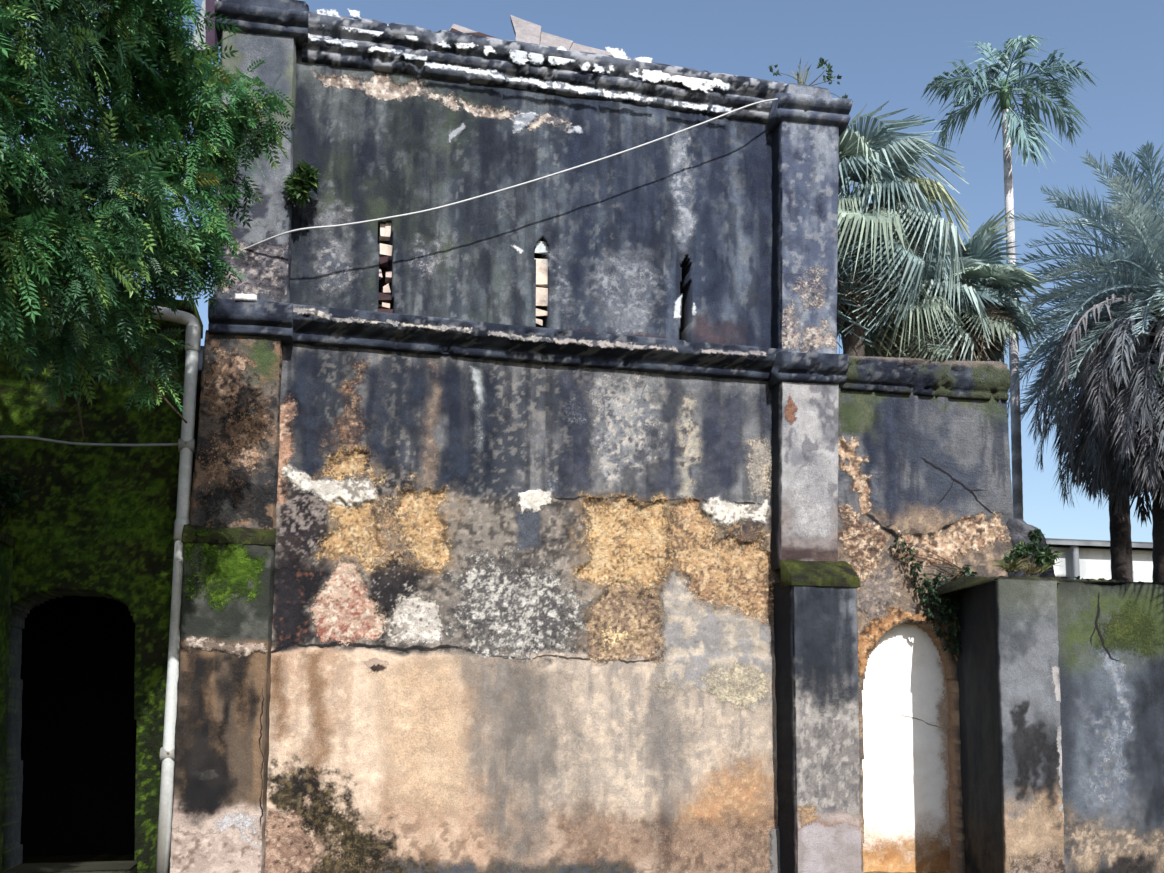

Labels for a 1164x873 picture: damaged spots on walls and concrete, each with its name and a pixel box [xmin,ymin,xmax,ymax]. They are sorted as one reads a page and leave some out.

spalling [313,72,583,143]
peeling [308,9,732,112]
peeling [782,268,837,353]
water stain [174,348,331,816]
water stain [361,552,425,645]
spalling [184,347,776,712]
water stain [542,371,749,500]
spalling [789,436,1011,676]
crack [864,457,995,537]
crack [1091,595,1119,661]
water stain [267,648,775,873]
water stain [1007,652,1164,873]